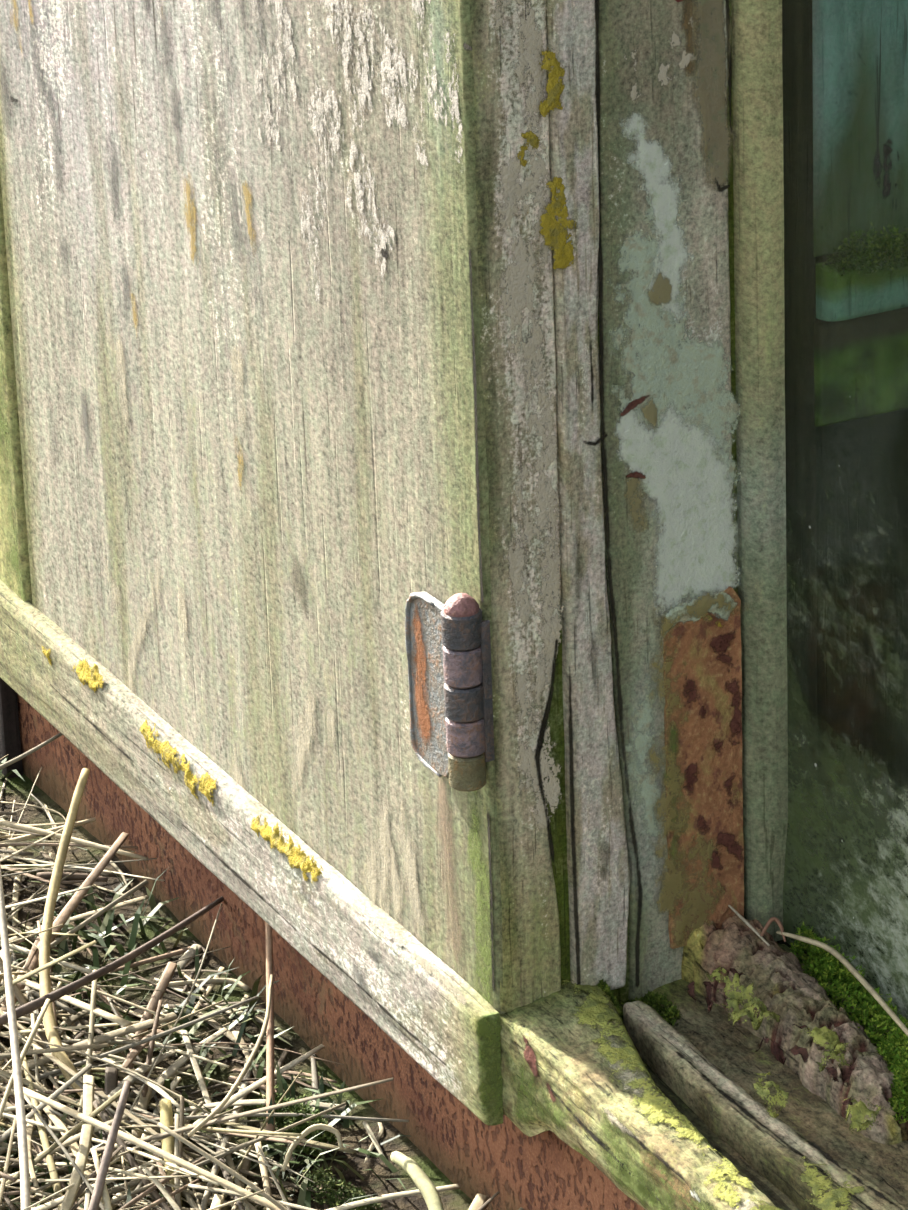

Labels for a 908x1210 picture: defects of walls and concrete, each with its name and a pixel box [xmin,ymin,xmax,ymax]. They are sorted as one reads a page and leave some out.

peeling [658,31,699,86]
peeling [610,50,741,628]
corrosion [412,609,431,742]
corrosion [683,676,707,718]
corrosion [710,631,742,752]
crack [535,639,581,989]
corrosion [684,763,698,793]
corrosion [697,815,744,870]
crack [543,1081,684,1204]
crack [675,1051,902,1210]